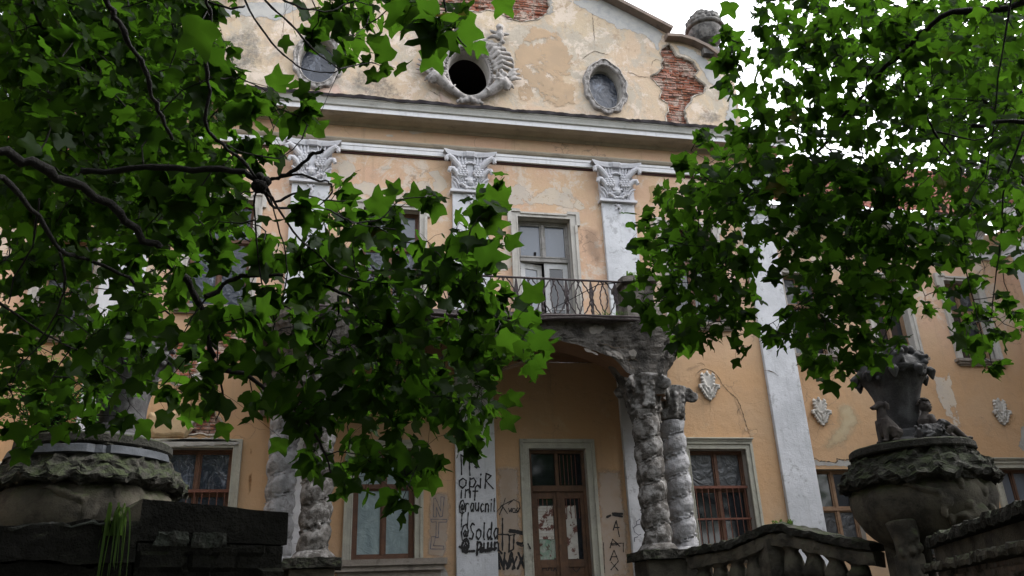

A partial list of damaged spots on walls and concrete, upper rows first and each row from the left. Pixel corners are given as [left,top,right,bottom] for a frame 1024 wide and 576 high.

peeling [438,0,575,107]
flaking render [570,0,721,124]
peeling [725,95,736,125]
crack [697,363,749,433]
peeling [934,373,961,427]